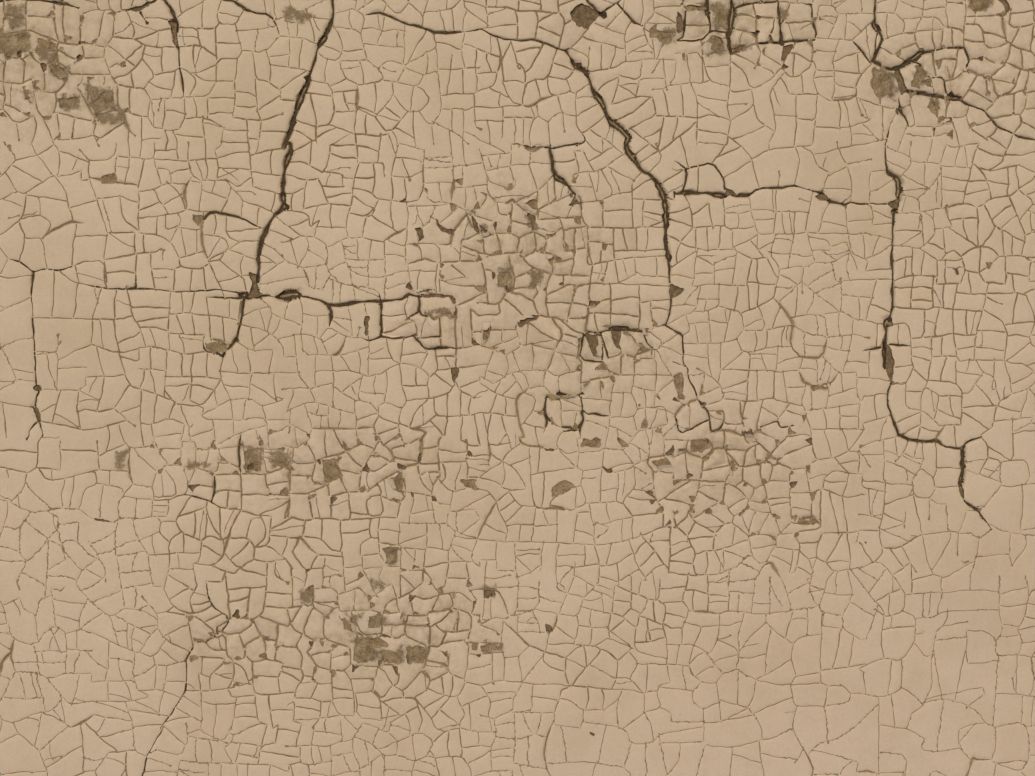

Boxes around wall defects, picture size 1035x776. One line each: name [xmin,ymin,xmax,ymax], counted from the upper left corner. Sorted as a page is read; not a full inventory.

peeling [0,4,98,120]
crack [58,10,230,188]
spalling [570,3,599,29]
crack [677,0,846,65]
crack [816,0,944,76]
peeling [870,43,970,139]
peeling [435,176,608,294]
crack [0,270,181,556]
peeling [158,429,414,504]
crack [556,326,742,538]
peeling [309,572,448,681]
crack [552,399,819,776]